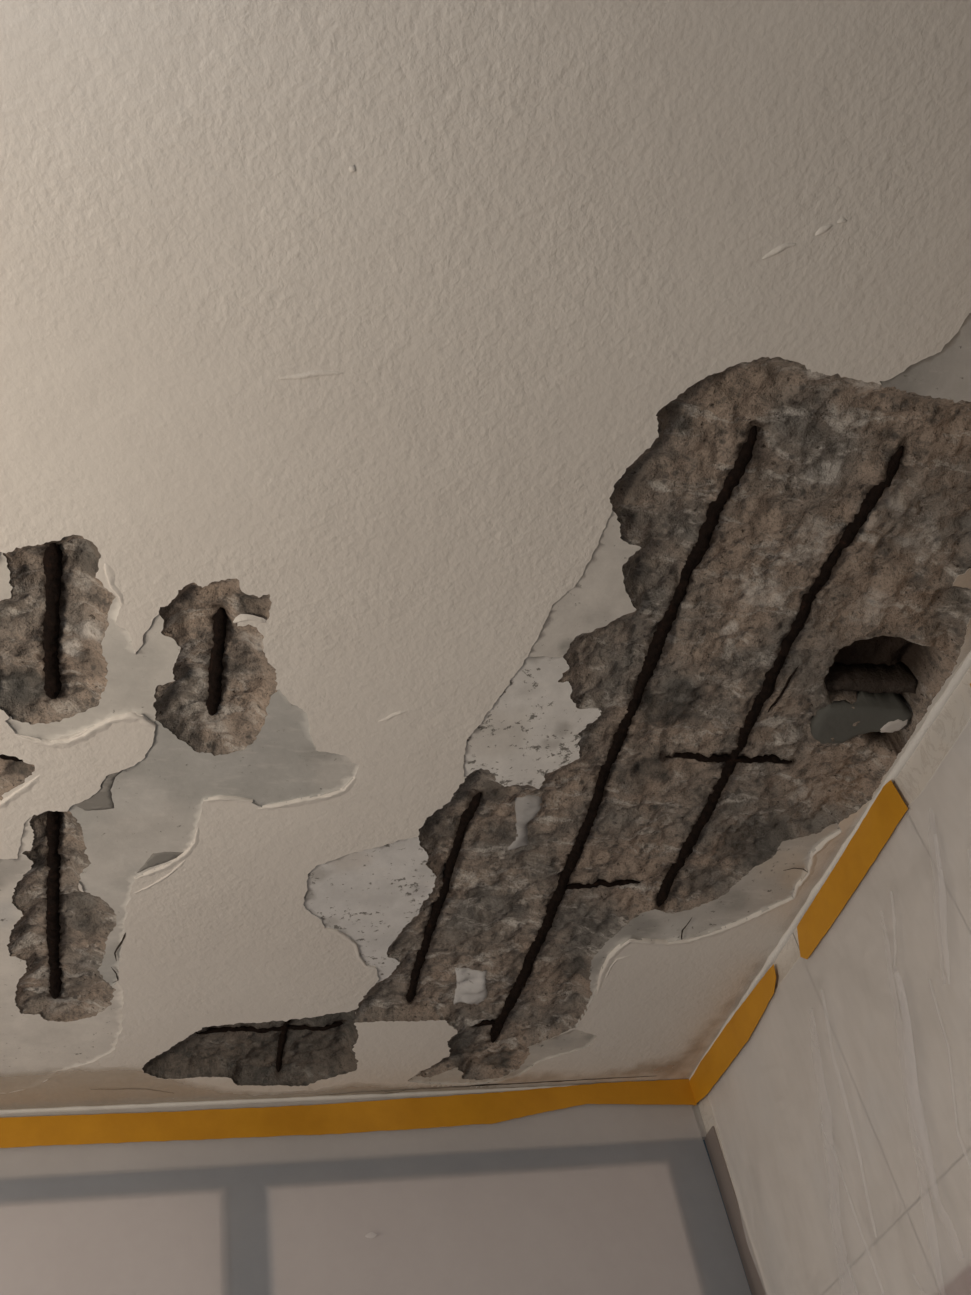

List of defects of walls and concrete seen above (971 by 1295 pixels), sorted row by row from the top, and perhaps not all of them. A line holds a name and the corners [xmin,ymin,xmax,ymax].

peeling [0,535,359,1094]
spalling [142,313,971,1087]